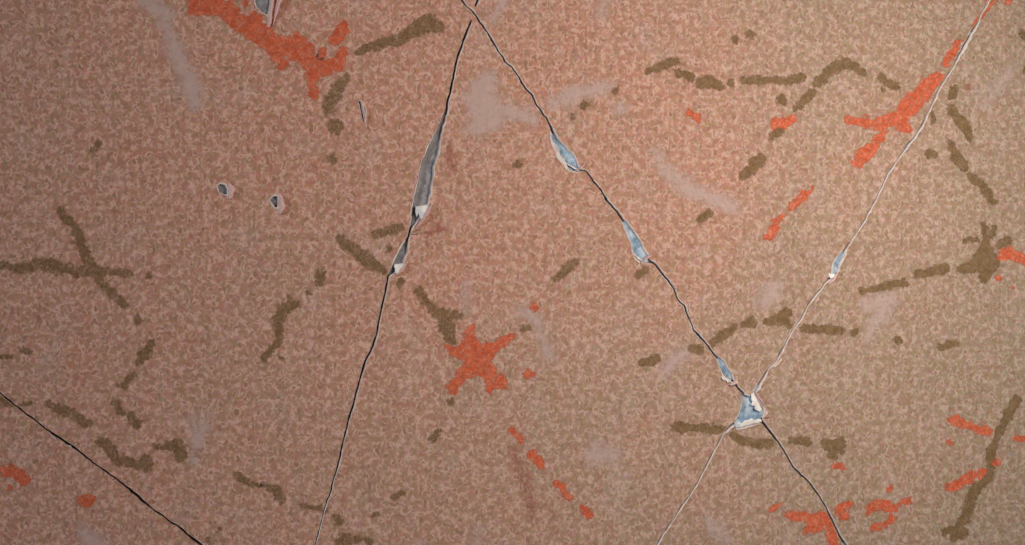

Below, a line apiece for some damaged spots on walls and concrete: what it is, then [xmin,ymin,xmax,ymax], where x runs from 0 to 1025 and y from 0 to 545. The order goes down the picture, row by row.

flaking render [253,0,270,17]
damp [0,207,133,308]
flaking render [214,181,228,197]
flaking render [267,193,284,211]
crack [312,0,992,545]
damp [638,222,1025,376]
crack [0,388,210,545]
damp [942,394,1025,542]